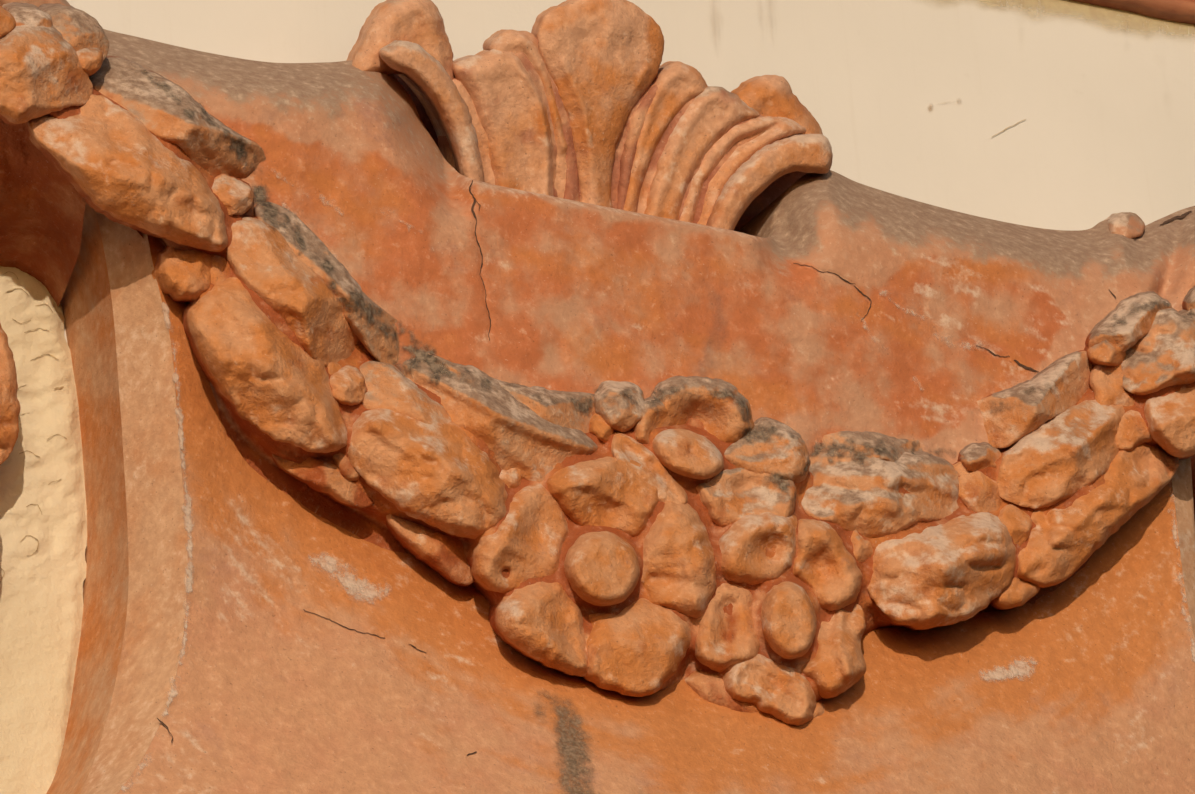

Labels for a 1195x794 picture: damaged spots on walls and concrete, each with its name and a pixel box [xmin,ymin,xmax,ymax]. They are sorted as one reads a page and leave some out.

crack [469,180,491,340]
crack [793,263,872,321]
crack [976,345,1039,372]
water stain [555,706,592,794]